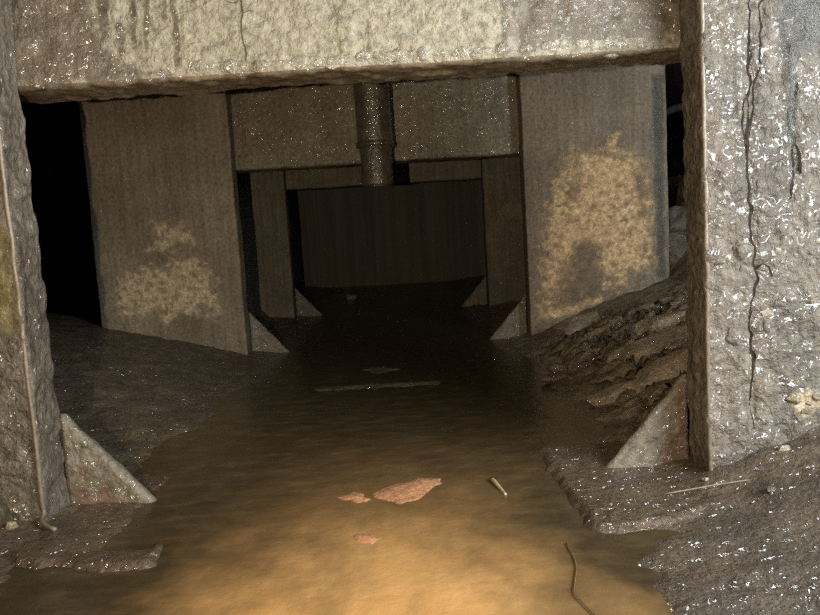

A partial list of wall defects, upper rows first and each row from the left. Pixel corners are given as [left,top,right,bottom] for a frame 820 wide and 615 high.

leakage [12,0,150,89]
leakage [162,0,180,67]
leakage [654,77,664,275]
crack [742,0,773,428]